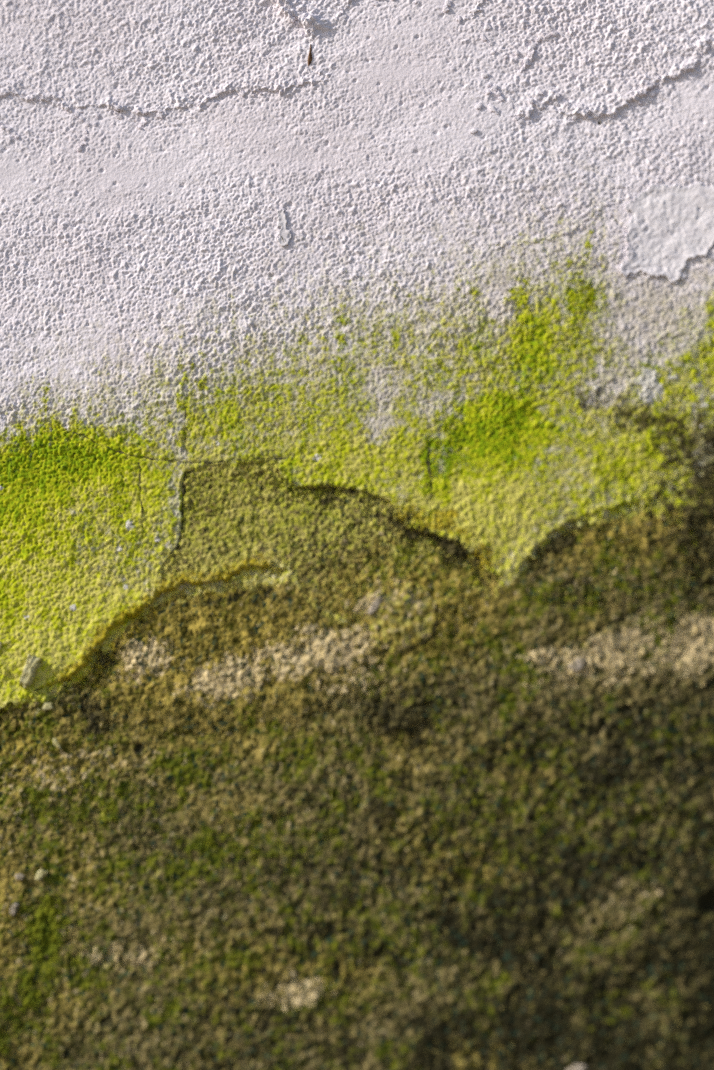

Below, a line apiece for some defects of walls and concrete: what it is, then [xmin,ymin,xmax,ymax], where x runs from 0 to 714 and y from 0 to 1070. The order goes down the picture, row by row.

flaking render [495,182,714,285]
leakage [333,305,349,375]
leakage [505,278,533,345]
leakage [561,230,594,347]
leakage [175,364,194,445]
crack [68,406,284,554]
leakage [420,415,470,495]
leakage [577,387,714,594]
leakage [318,483,491,583]
leakage [536,521,589,556]
leakage [81,689,109,745]
leakage [325,681,431,736]